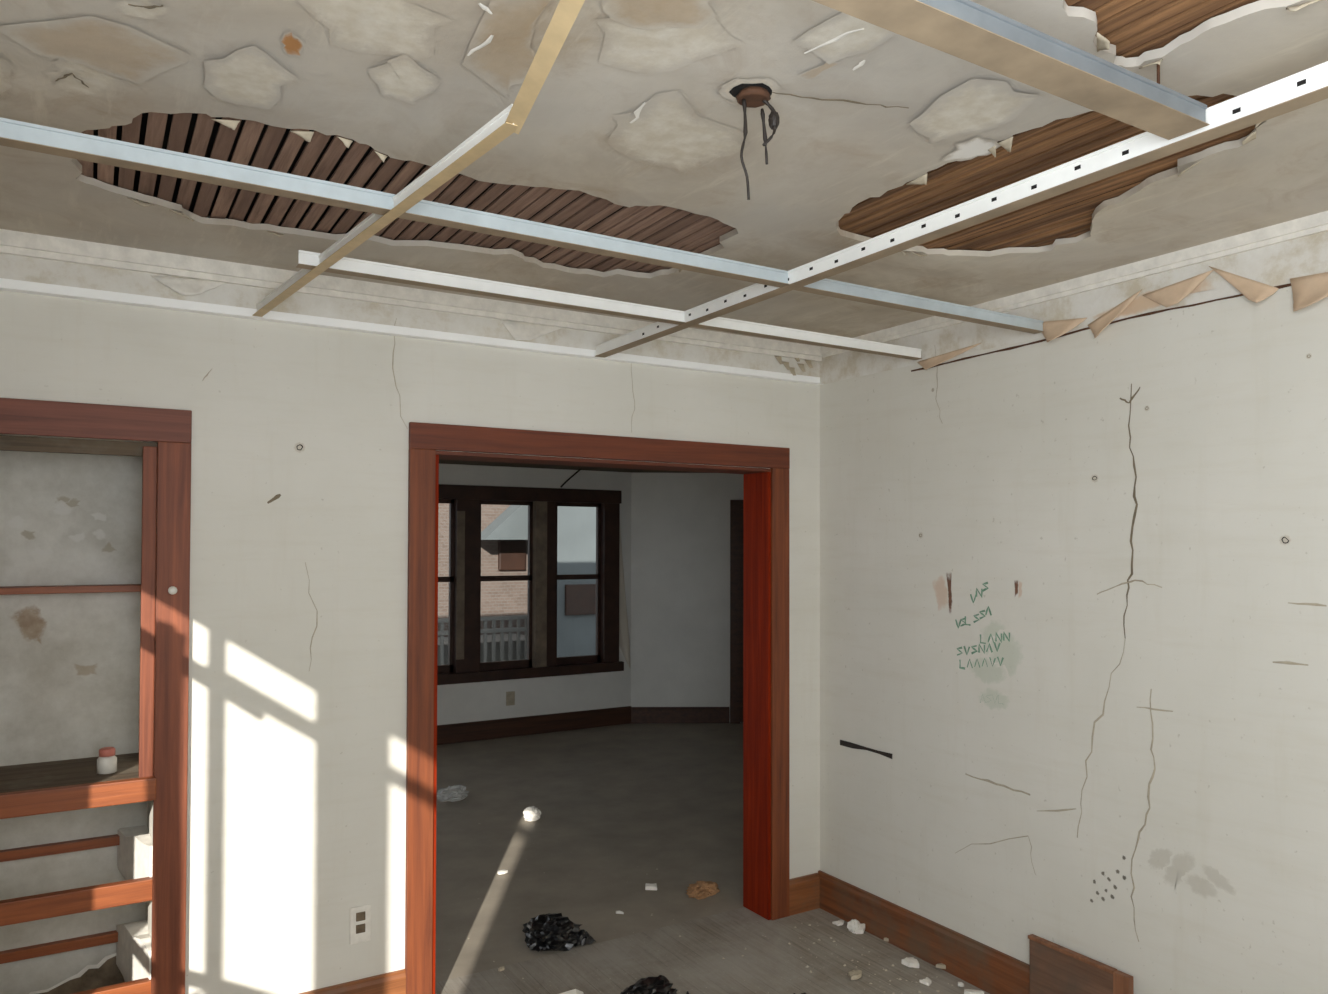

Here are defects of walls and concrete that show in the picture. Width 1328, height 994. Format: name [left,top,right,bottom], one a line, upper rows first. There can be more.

flaking render [1065,0,1259,69]
flaking render [1286,0,1322,12]
flaking render [77,159,372,237]
flaking render [81,46,432,194]
flaking render [375,218,682,273]
flaking render [422,173,736,254]
flaking render [839,78,1147,238]
flaking render [901,122,1262,257]
flaking render [1188,94,1237,108]
crack [1077,384,1162,838]
crack [1130,689,1156,942]
flaking render [29,953,125,994]